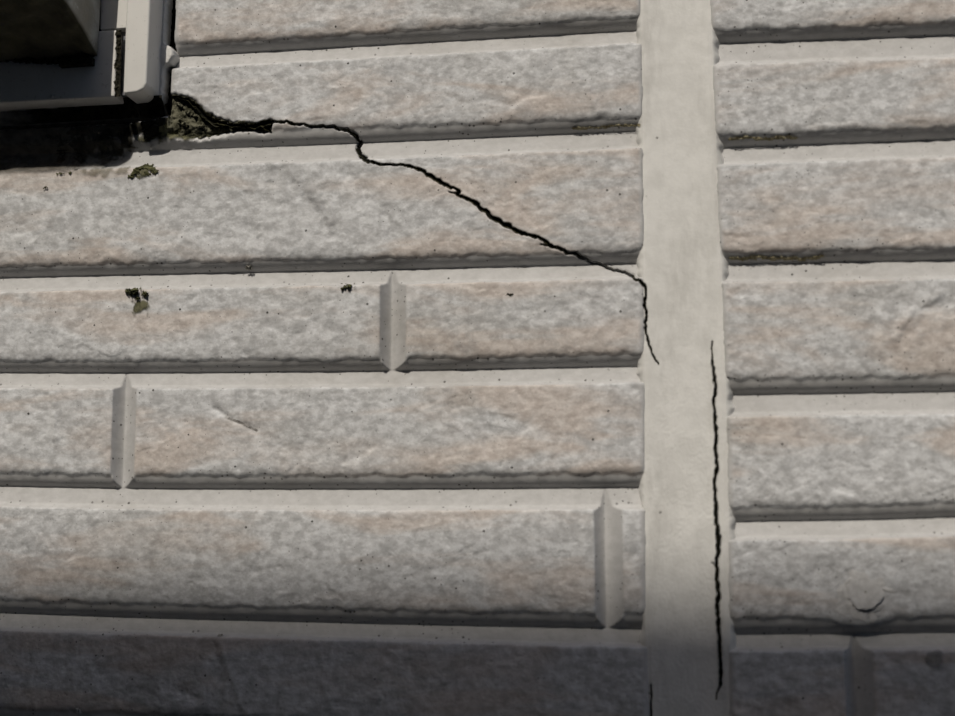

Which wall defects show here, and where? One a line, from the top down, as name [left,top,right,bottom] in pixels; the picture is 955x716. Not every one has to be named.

water stain [10,95,175,170]
crack [174,96,659,364]
crack [710,342,724,700]